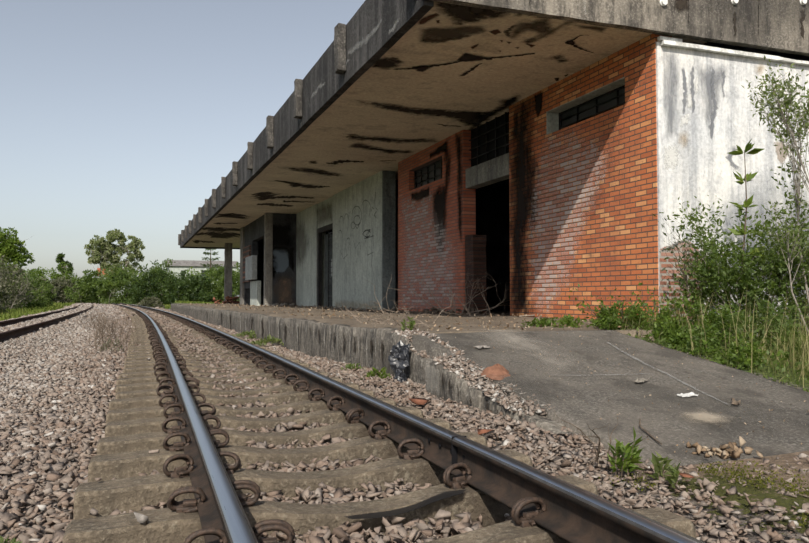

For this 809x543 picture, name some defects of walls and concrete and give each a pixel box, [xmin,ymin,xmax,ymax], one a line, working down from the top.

leakage [675,0,688,11]
leakage [422,2,556,43]
crack [565,35,593,53]
leakage [371,57,402,69]
leakage [535,92,543,116]
leakage [667,58,725,137]
leakage [347,134,446,161]
leakage [289,160,363,176]
leakage [371,102,485,237]
leakage [250,180,329,207]